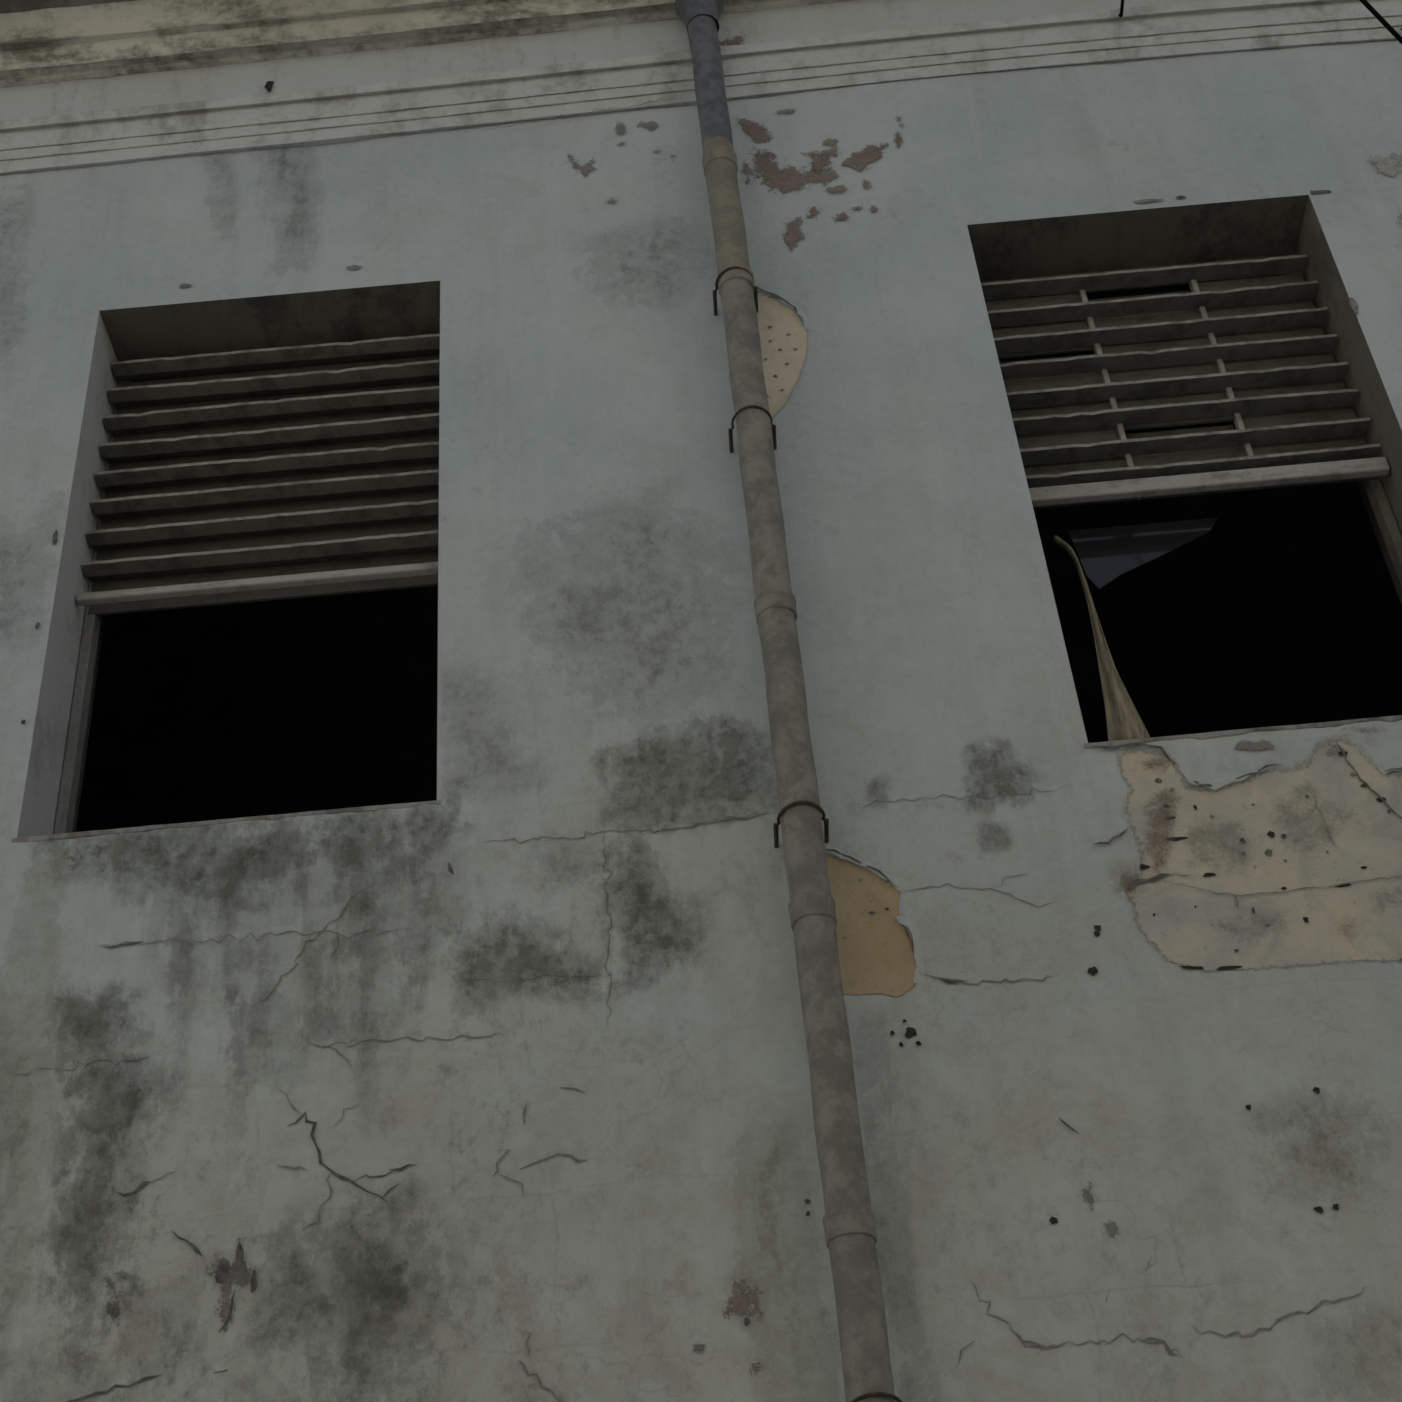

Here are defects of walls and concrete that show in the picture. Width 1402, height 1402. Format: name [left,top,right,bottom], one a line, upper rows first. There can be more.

peeling [737,116,904,250]
spalling [757,287,812,418]
crack [98,885,404,1007]
crack [450,812,778,1031]
spalling [825,844,926,997]
crack [905,874,1056,907]
crack [921,973,1053,985]
spalling [1090,728,1402,973]
crack [306,1033,504,1068]
crack [278,1089,417,1231]
crack [957,1280,1364,1366]